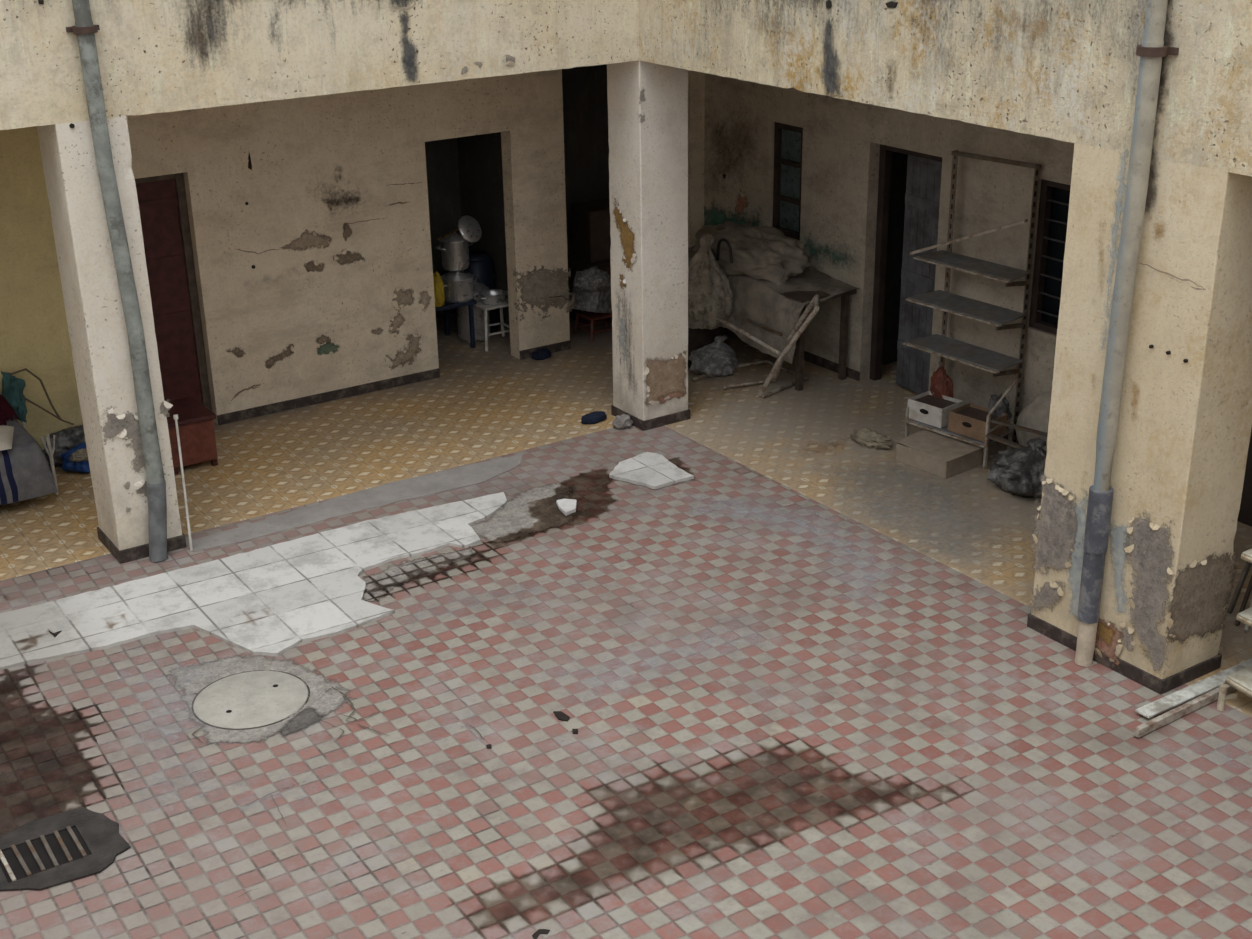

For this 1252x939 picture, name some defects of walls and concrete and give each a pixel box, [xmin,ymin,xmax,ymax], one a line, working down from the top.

water stain [186,0,226,59]
water stain [391,0,417,81]
water stain [807,0,840,97]
peeling [237,223,365,272]
peeling [613,198,637,291]
flaking render [643,351,687,407]
peeling [101,408,147,496]
peeling [1029,475,1080,612]
peeling [1094,513,1237,674]
water stain [0,664,123,839]
water stain [590,742,925,870]
water stain [542,857,591,905]